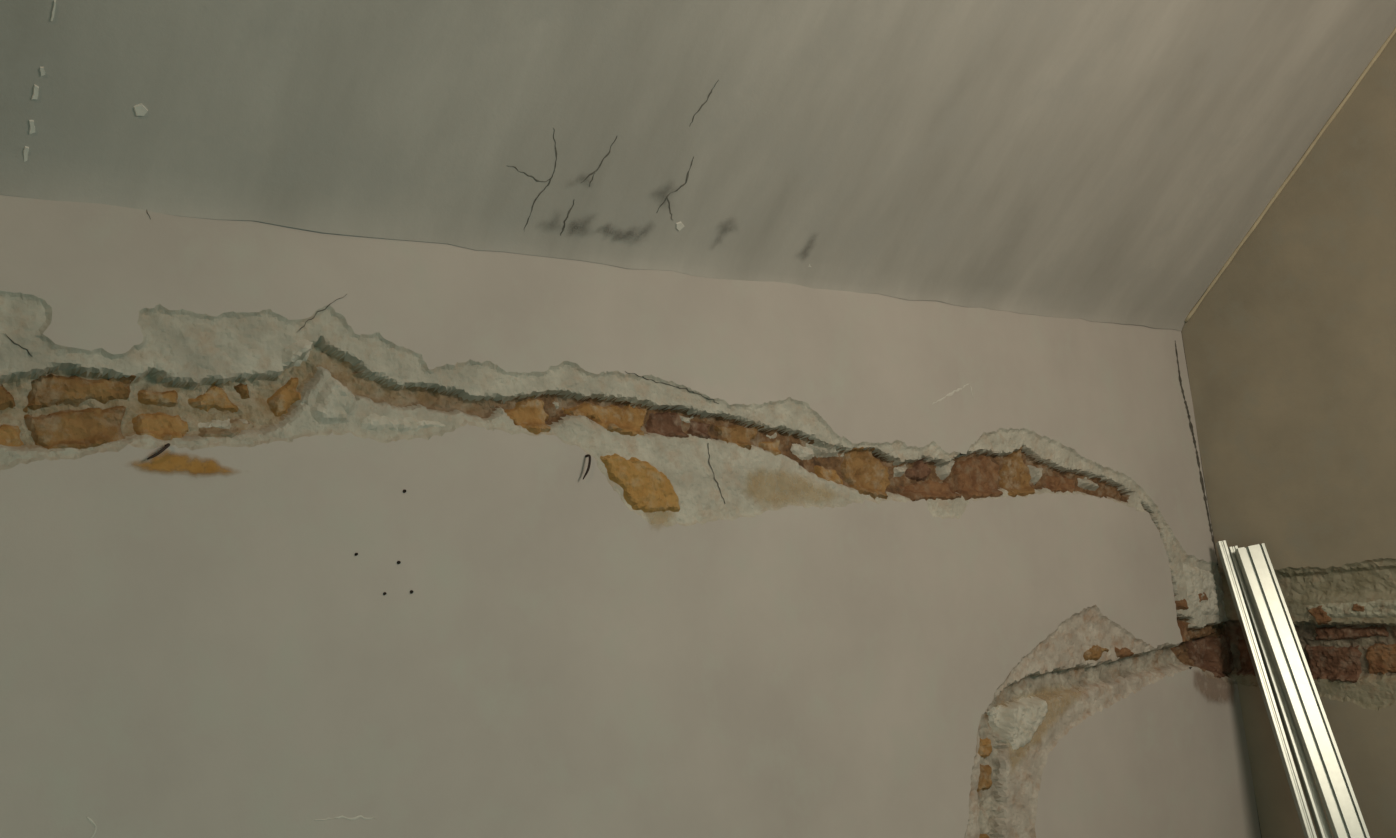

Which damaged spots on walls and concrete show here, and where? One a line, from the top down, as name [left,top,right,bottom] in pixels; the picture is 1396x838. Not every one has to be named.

crack [509,129,617,236]
crack [657,81,718,220]
flaking render [0,291,1259,838]
flaking render [1274,558,1396,711]